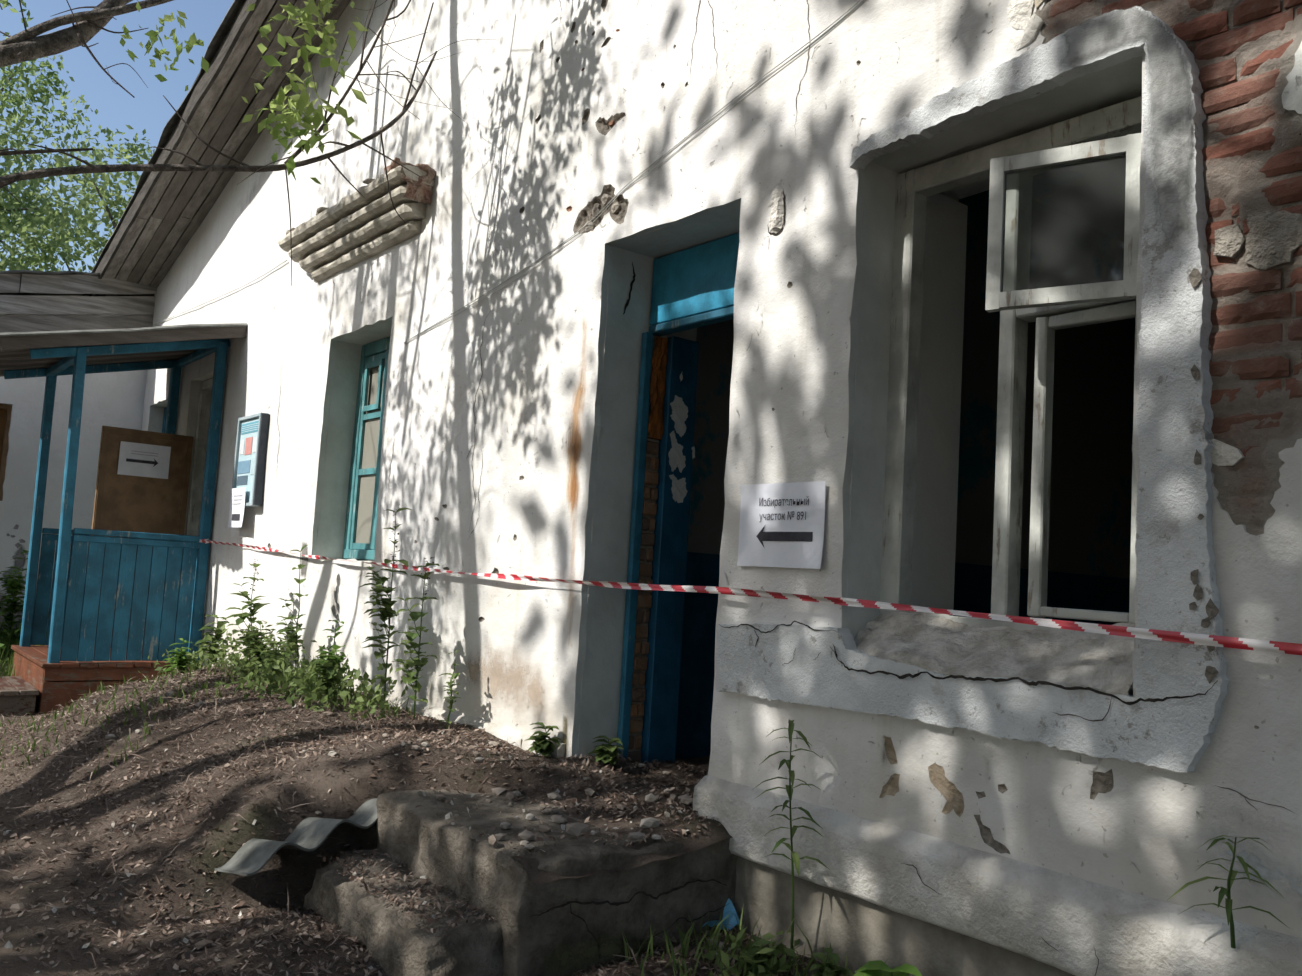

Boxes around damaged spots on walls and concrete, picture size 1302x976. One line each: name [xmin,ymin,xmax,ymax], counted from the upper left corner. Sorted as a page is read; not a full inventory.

crack [690,1,717,79]
crack [794,3,810,135]
flaking render [582,108,626,135]
flaking render [566,184,629,234]
flaking render [1007,0,1302,536]
crack [467,315,488,537]
rust [567,375,582,511]
peeling [1189,569,1219,628]
crack [720,620,1218,722]
peeling [1205,645,1219,684]
peeling [879,735,900,798]
peeling [928,763,1010,854]